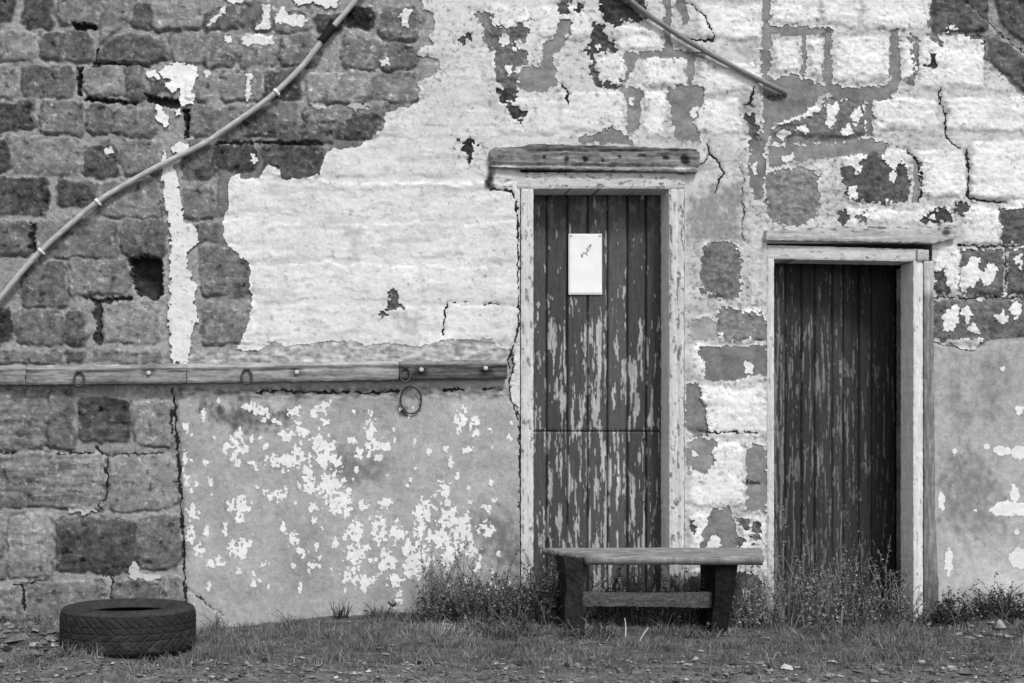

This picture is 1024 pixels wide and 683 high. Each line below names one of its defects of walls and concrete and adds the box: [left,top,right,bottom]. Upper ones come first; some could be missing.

crack [56,388,222,615]
peeling [129,141,199,364]
crack [255,388,421,412]
peeling [182,399,511,605]
crack [441,187,521,572]
peeling [455,0,584,125]
peeling [578,0,706,146]
crack [700,143,746,241]
peeling [684,241,767,475]
peeling [743,0,1024,228]
crack [938,87,1005,203]
peeling [933,208,1024,343]